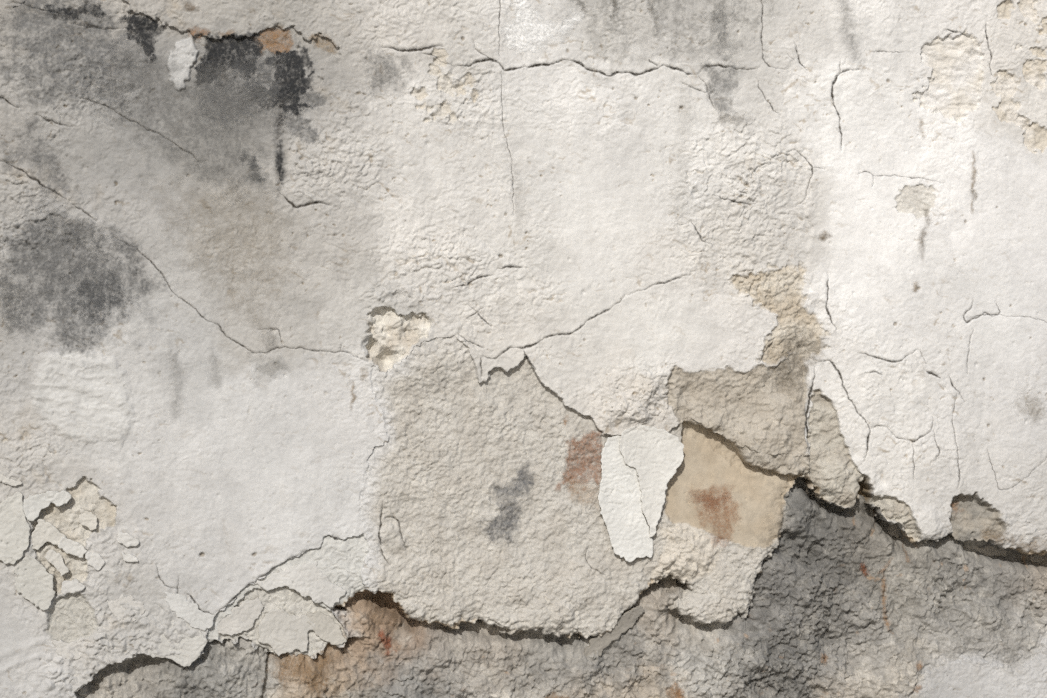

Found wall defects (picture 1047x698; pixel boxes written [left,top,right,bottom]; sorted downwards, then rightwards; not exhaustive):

damp [16,1,113,101]
crack [392,46,435,55]
crack [460,10,773,109]
crack [831,66,848,141]
spalling [912,0,1047,154]
crack [6,162,60,195]
damp [275,141,284,184]
damp [5,222,150,352]
crack [470,310,606,368]
spalling [0,259,1047,698]
corrosion [558,432,602,485]
crack [805,360,960,478]